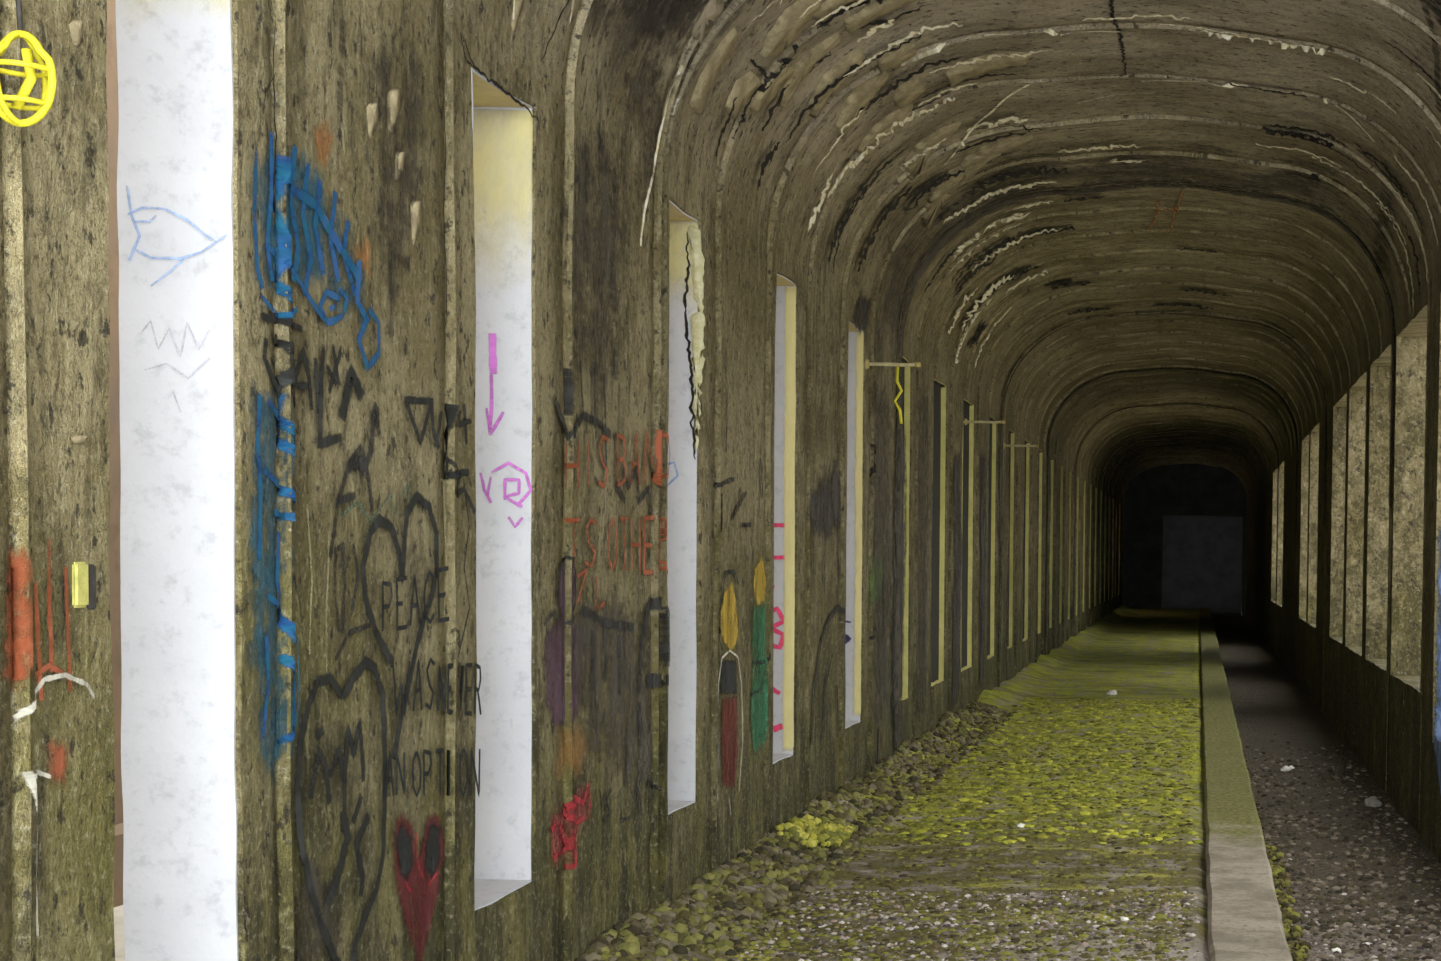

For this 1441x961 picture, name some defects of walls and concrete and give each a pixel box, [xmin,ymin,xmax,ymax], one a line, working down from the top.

leakage [559,0,782,394]
leakage [799,0,865,27]
crack [716,0,1015,190]
leakage [808,83,977,232]
leakage [901,84,1029,171]
crack [827,125,1118,349]
leakage [843,14,1336,77]
crack [1086,0,1127,77]
leakage [1081,80,1374,142]
leakage [1329,76,1398,117]
leakage [1416,0,1441,111]
crack [1153,288,1232,309]